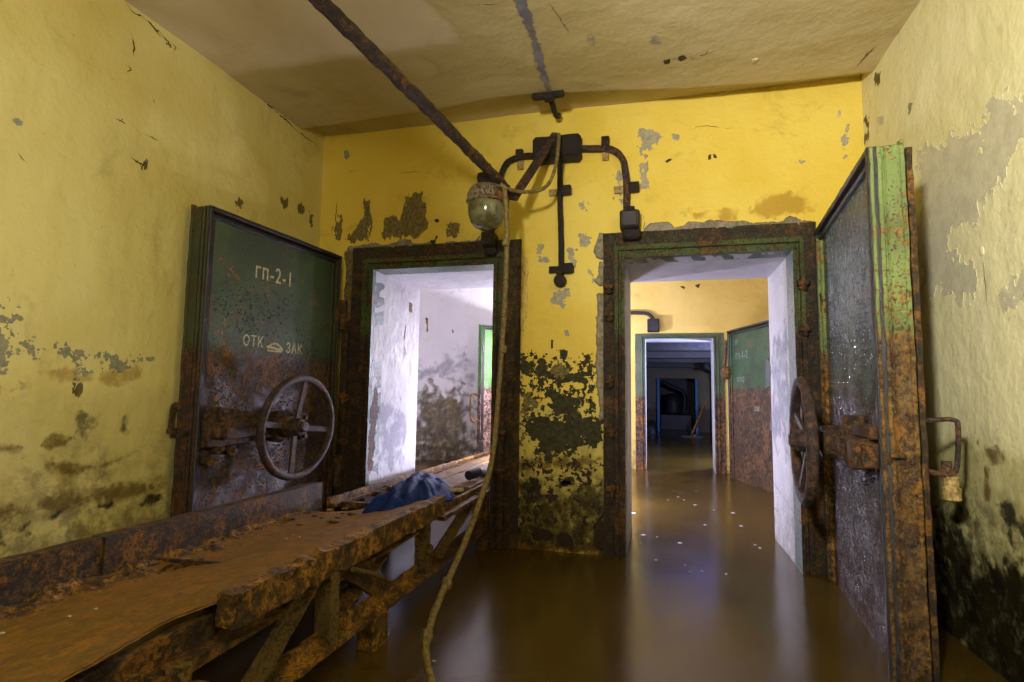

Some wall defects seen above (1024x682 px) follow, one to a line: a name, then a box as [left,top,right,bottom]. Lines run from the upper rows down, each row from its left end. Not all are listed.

peeling [636,128,680,190]
peeling [332,191,481,252]
peeling [914,86,1024,308]
peeling [998,268,1024,320]
peeling [0,297,155,398]
water stain [48,413,88,449]
water stain [416,379,477,461]
water stain [41,491,82,519]
water stain [96,483,161,509]
water stain [518,453,604,555]
water stain [933,506,1024,682]